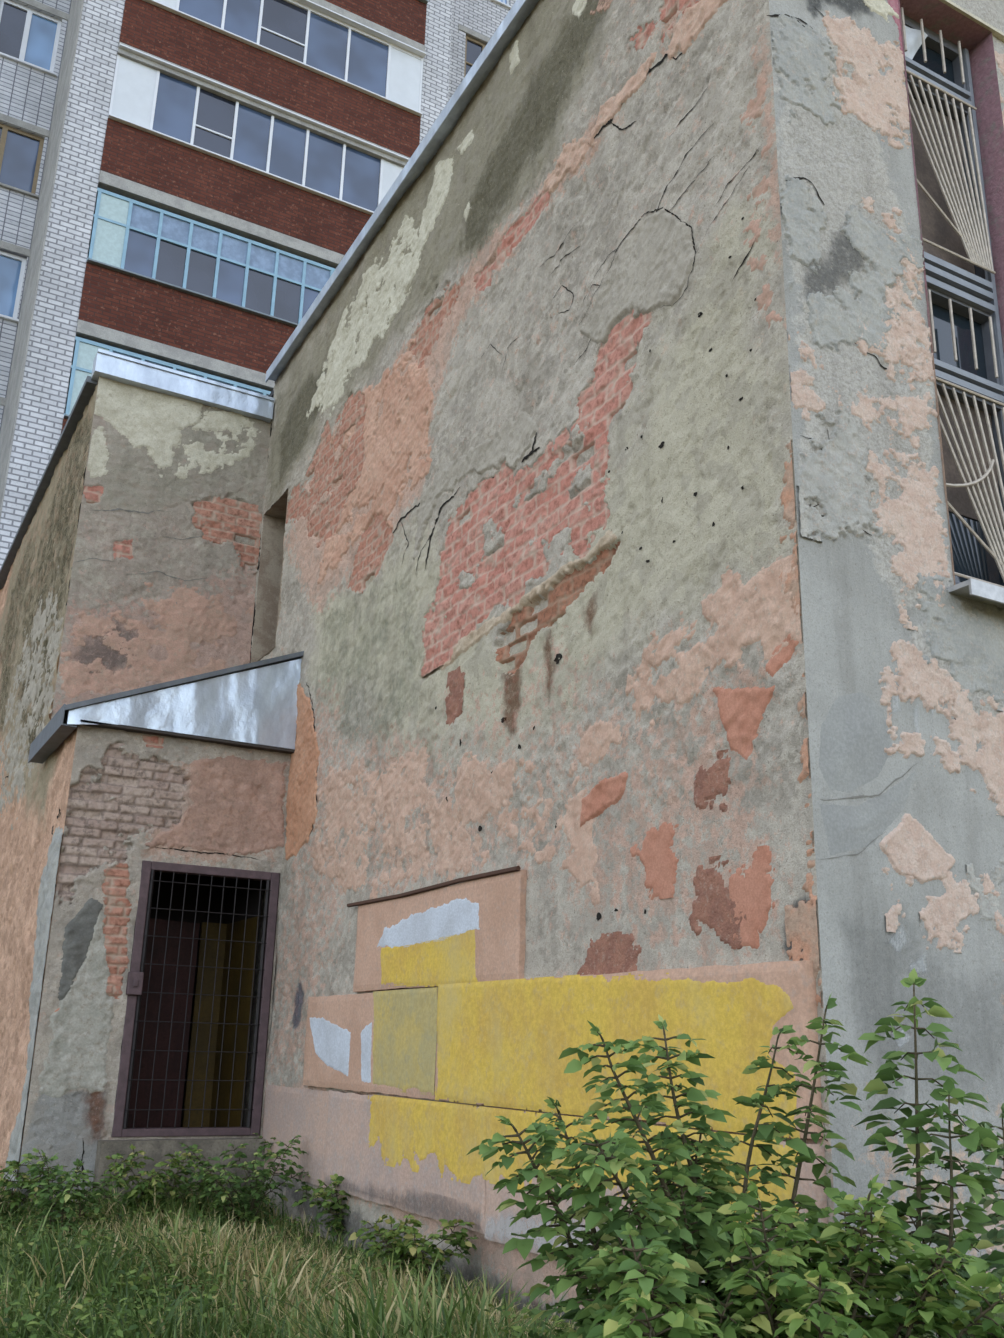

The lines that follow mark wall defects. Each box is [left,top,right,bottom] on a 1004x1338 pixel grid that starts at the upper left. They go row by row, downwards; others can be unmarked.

crack [647,53,682,74]
peeling [740,0,911,150]
leakage [809,0,869,15]
flaking render [285,0,728,594]
crack [540,88,759,363]
peeling [83,376,261,503]
flaking render [421,208,695,726]
peeling [625,172,1004,816]
flaking render [3,735,191,1204]
peeling [0,578,253,831]
peeling [285,684,642,975]
peeling [688,831,823,1008]